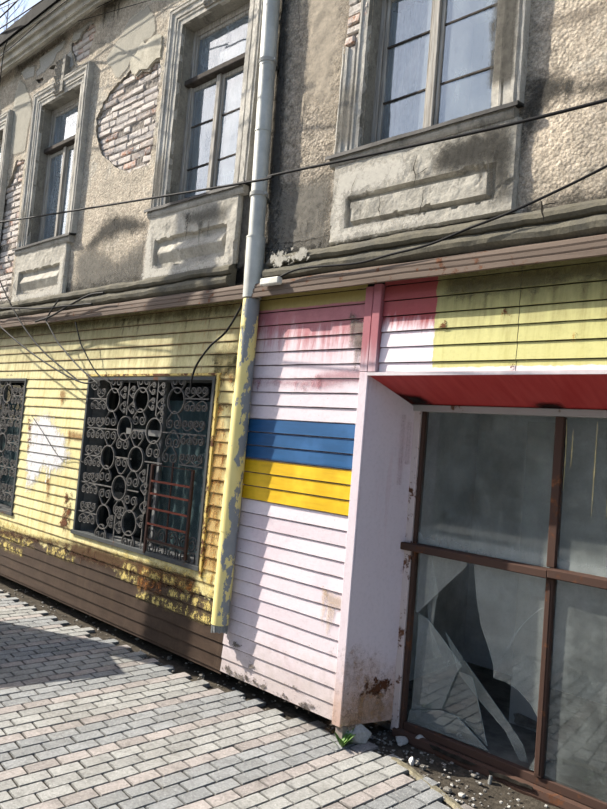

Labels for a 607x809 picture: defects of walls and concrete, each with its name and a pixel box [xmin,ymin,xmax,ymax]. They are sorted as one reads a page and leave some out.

flaking render [98,33,163,172]
water stain [521,71,607,142]
water stain [432,124,512,196]
flaking render [0,160,65,302]
peeling [26,414,70,485]
peeling [0,522,33,556]
peeling [115,552,212,624]
rust [350,653,392,729]